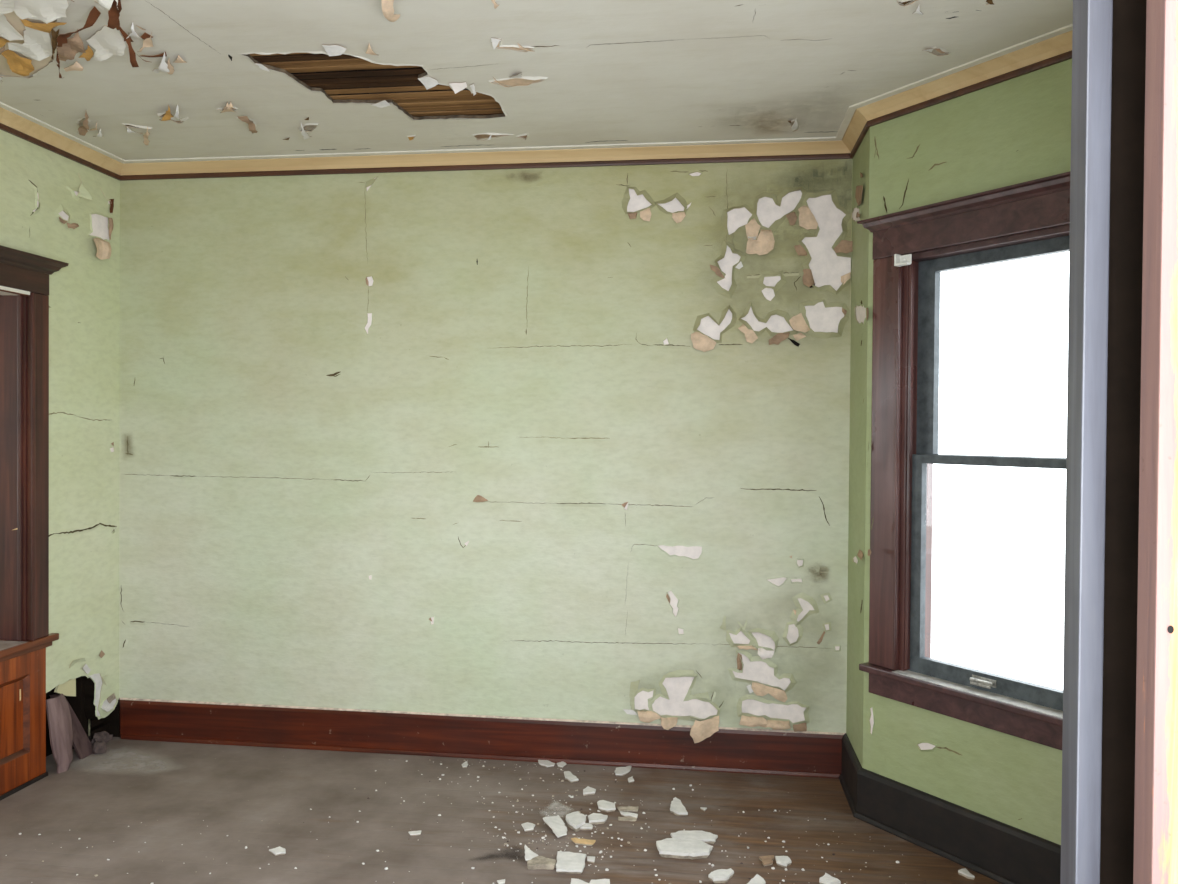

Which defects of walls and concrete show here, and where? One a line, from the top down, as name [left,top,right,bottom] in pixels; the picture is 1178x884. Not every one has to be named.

peeling [0,0,187,84]
spalling [238,43,549,121]
peeling [622,187,691,223]
crack [880,179,909,215]
peeling [691,173,869,352]
crack [125,437,610,481]
crack [49,523,117,537]
crack [486,501,699,553]
crack [740,488,830,527]
peeling [720,556,841,732]
spalling [46,658,120,757]
peeling [623,670,720,743]